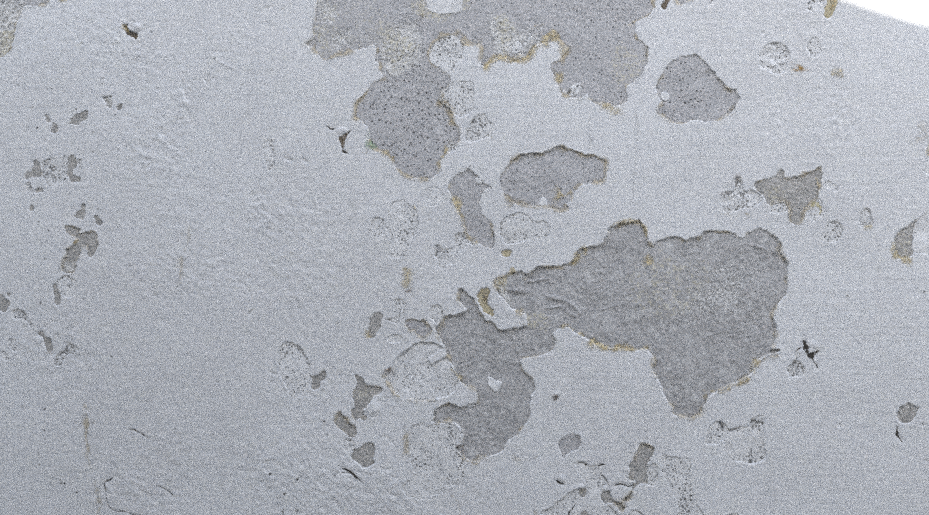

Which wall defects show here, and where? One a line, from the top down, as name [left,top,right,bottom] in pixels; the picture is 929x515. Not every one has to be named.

peeling [0,0,49,57]
peeling [824,0,838,18]
peeling [306,0,688,181]
peeling [656,55,739,124]
flaking render [67,155,81,183]
peeling [448,146,607,257]
peeling [754,167,823,225]
peeling [62,204,103,273]
peeling [0,293,11,312]
peeling [405,219,788,465]
flaking render [310,371,326,390]
peeling [601,443,658,511]